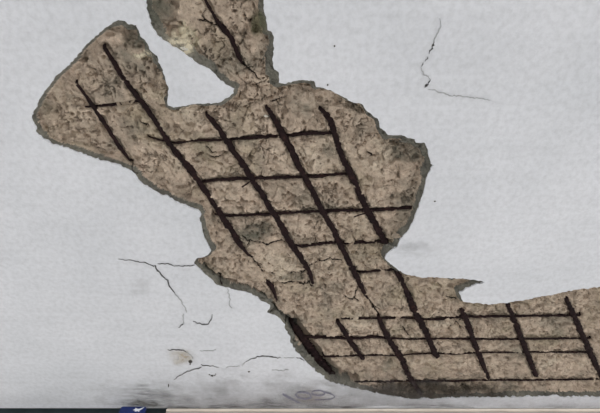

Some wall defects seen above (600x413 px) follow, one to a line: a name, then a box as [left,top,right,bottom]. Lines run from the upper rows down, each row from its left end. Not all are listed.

crack [421,20,487,100]
spalling [32,0,510,395]
crack [119,259,212,328]
crack [169,349,304,378]
spalling [392,269,600,383]
spalling [442,308,600,398]